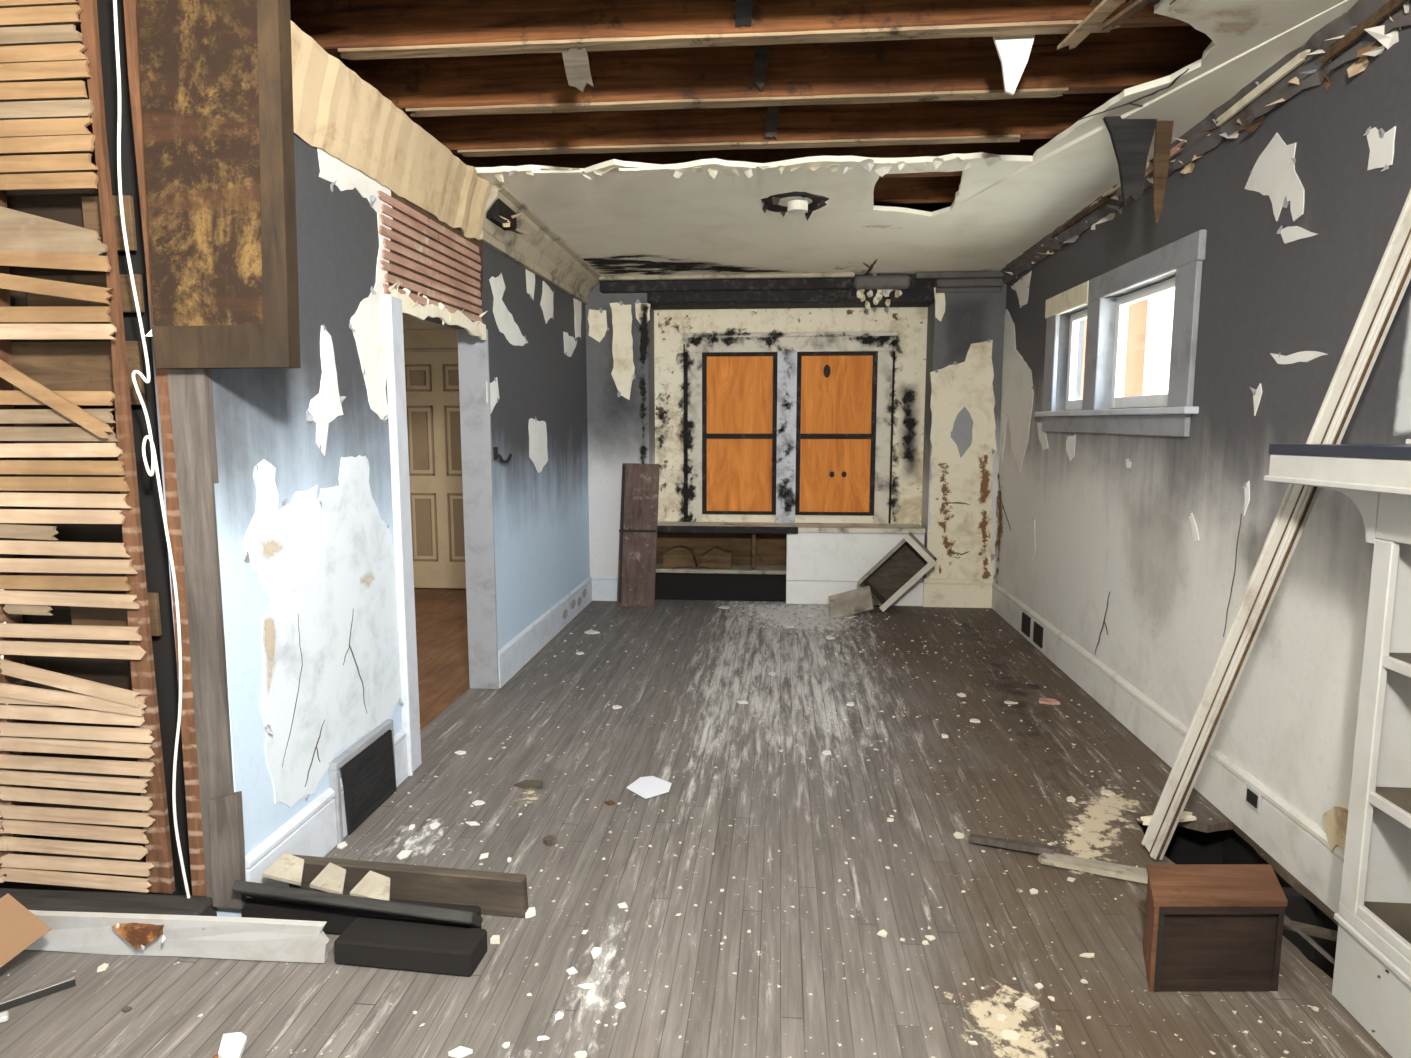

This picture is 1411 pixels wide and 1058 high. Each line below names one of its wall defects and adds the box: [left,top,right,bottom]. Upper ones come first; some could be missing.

peeling [1288,0,1409,90]
peeling [494,157,944,182]
peeling [1363,126,1396,172]
spalling [317,147,528,422]
peeling [526,269,651,400]
peeling [927,189,1127,579]
peeling [1250,383,1262,416]
peeling [1270,351,1328,364]
peeling [1395,302,1411,433]
peeling [528,417,548,474]
peeling [243,324,404,808]